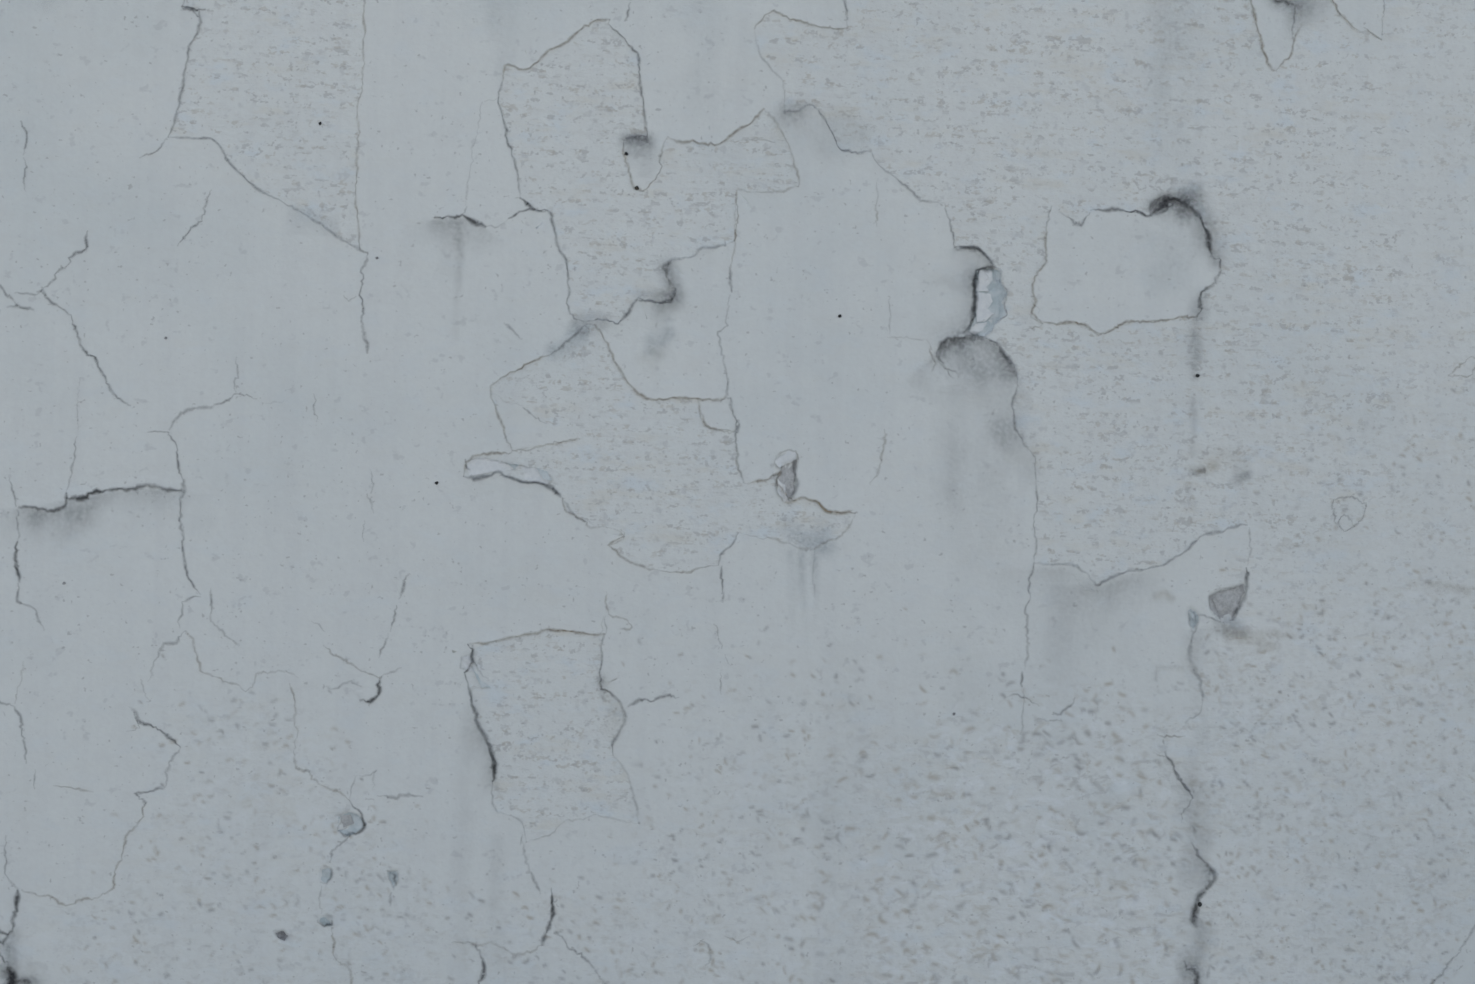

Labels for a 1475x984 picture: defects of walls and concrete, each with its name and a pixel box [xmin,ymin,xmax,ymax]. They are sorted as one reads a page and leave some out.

peeling [151,0,383,269]
crack [431,205,528,227]
peeling [447,0,1391,603]
crack [18,454,182,511]
flaking render [1188,584,1245,629]
crack [357,673,382,703]
peeling [447,611,656,859]
crack [0,896,19,984]